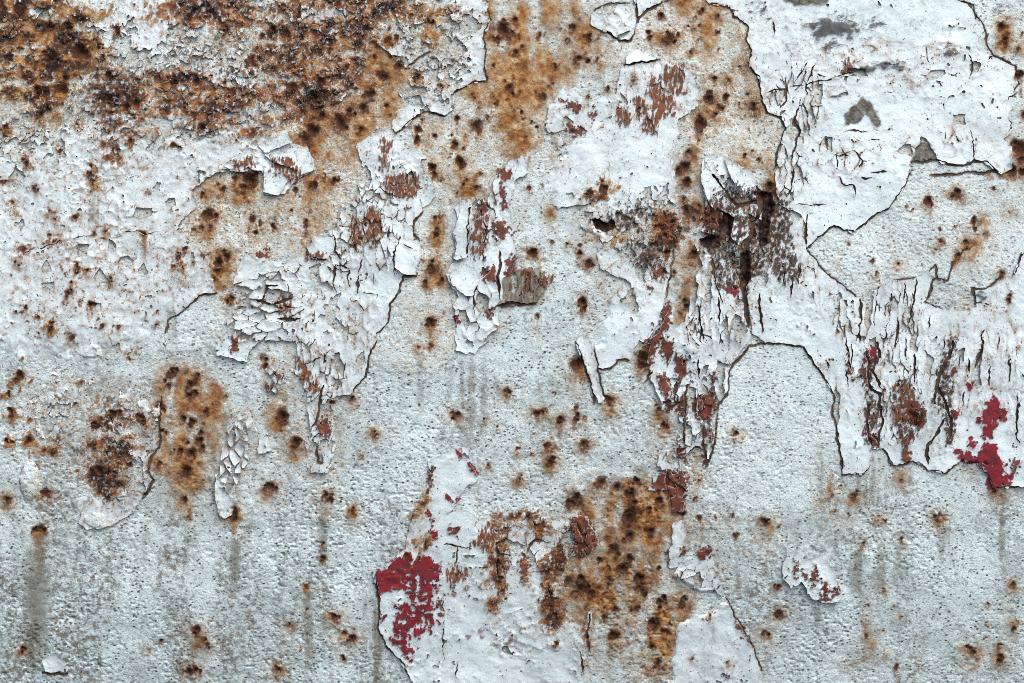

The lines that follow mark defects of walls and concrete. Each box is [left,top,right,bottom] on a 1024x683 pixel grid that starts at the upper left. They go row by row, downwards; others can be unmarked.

corrosion [0,0,605,246]
peeling [0,0,1024,530]
corrosion [646,49,765,325]
corrosion [734,146,777,202]
crack [575,0,1023,476]
corrosion [0,356,229,520]
corrosion [226,504,242,532]
peeling [372,447,600,683]
corrosion [449,471,735,680]
crack [725,597,762,671]
peeling [782,552,842,603]